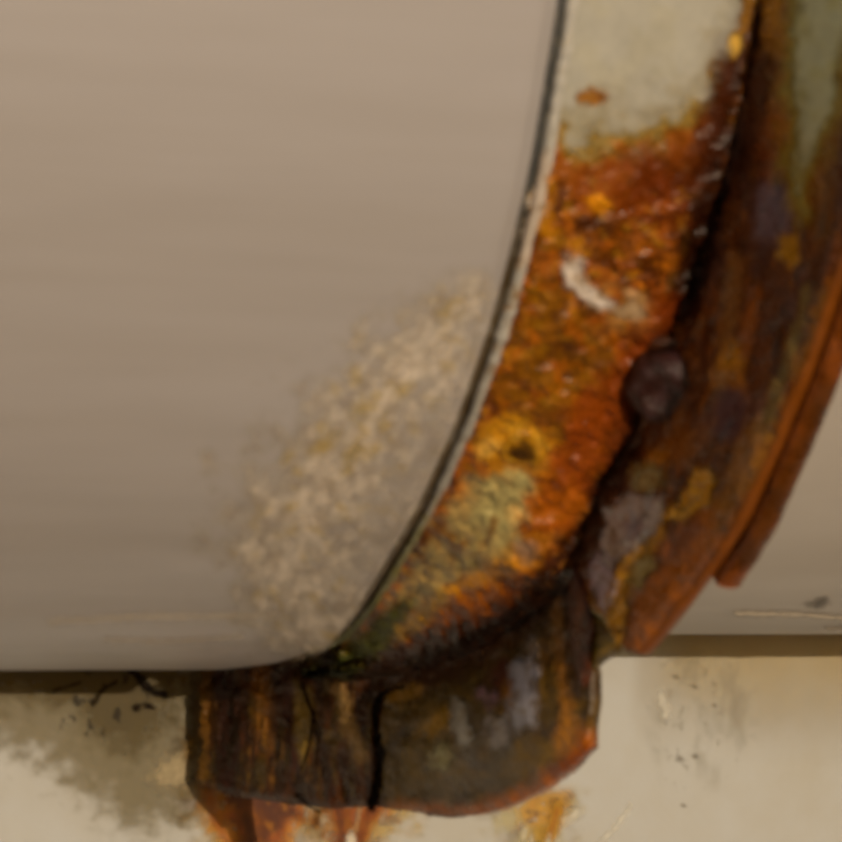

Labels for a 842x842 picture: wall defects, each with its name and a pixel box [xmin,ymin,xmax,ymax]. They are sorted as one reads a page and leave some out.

corrosion [238,0,842,690]
water stain [186,670,204,759]
corrosion [184,771,405,842]